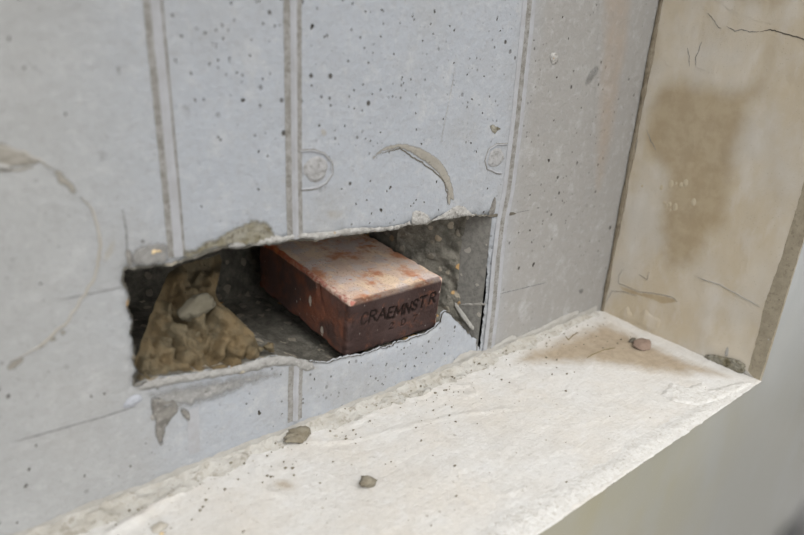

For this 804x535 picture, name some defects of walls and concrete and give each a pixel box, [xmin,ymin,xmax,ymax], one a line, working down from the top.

damp [611,22,783,280]
crack [709,15,804,40]
spalling [121,144,488,444]